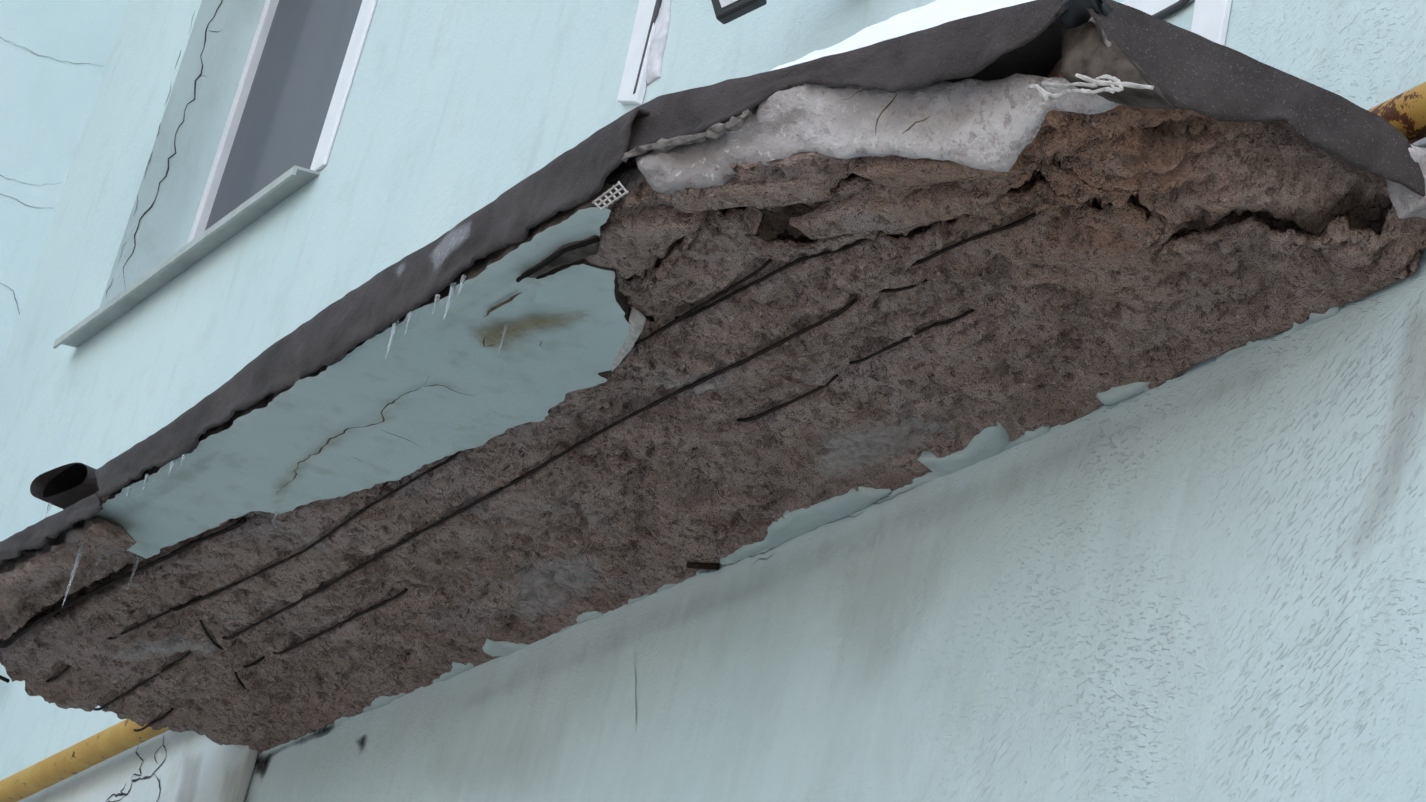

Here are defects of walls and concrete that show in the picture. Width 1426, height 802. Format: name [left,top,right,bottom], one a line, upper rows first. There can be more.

crack [0,37,99,66]
crack [106,0,223,297]
crack [0,175,62,208]
spalling [584,150,1036,346]
spalling [918,177,1102,260]
spalling [1067,200,1166,256]
spalling [1153,213,1323,270]
spalling [1320,204,1426,273]
crack [276,379,472,494]
spalling [222,298,857,640]
spalling [67,513,270,595]
spalling [169,451,461,611]